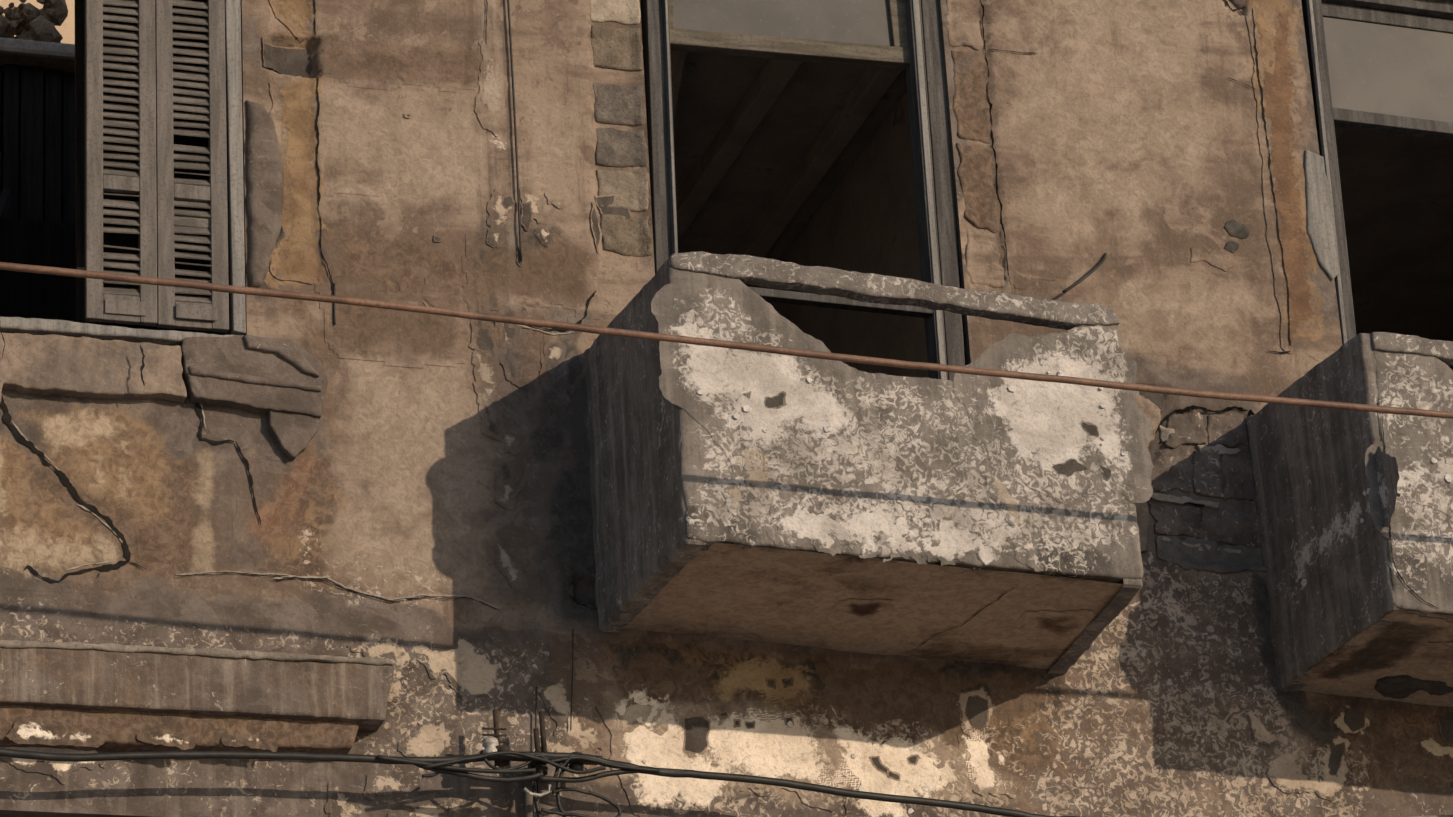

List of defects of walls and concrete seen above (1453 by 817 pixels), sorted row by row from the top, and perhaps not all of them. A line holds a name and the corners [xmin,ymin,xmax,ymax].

flaking render [590,0,653,257]
crack [980,0,1034,281]
crack [1223,0,1291,353]
flaking render [1190,0,1325,354]
crack [138,345,146,386]
crack [0,396,500,610]
peeling [348,633,516,705]
damp [539,377,736,700]
peeling [539,643,1017,817]
crack [918,587,1015,647]
peeling [651,283,1453,613]
damp [1240,570,1453,792]